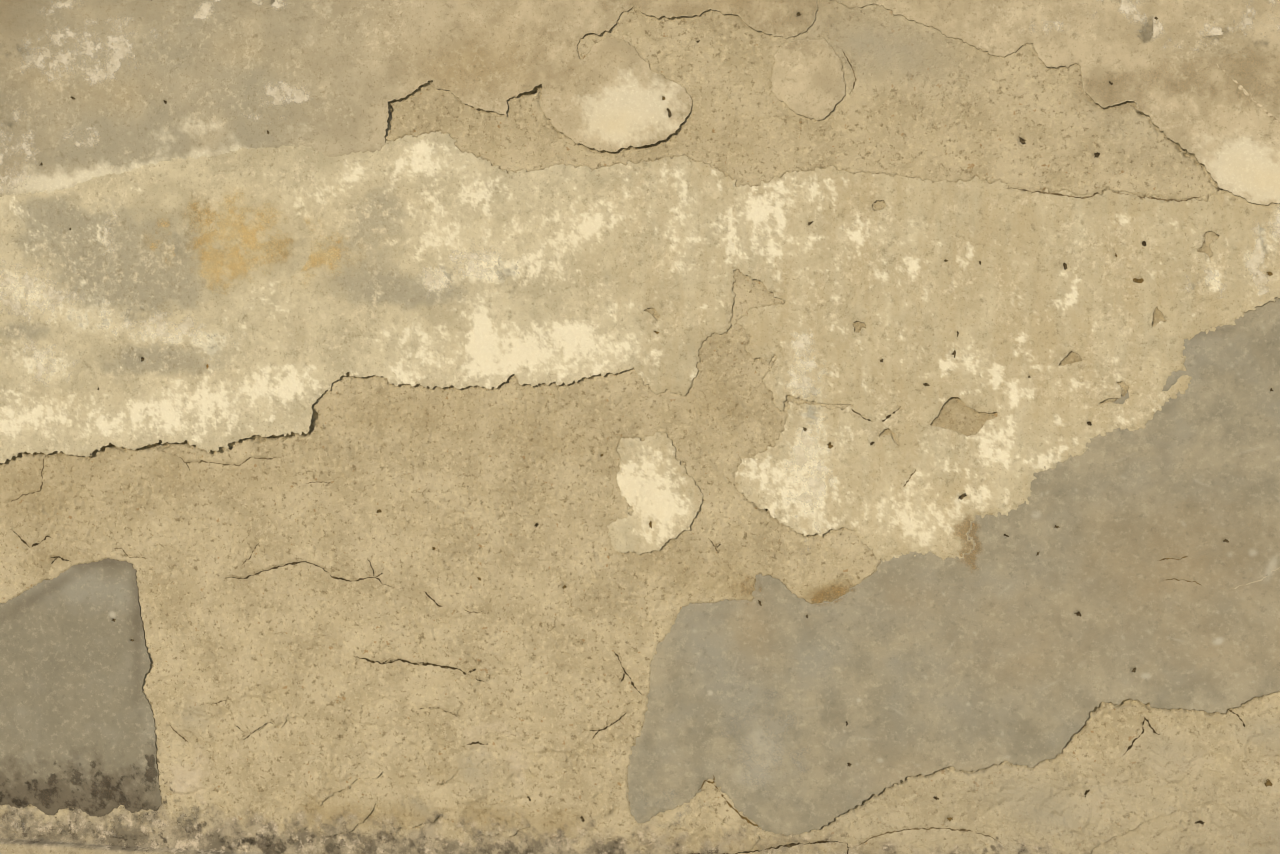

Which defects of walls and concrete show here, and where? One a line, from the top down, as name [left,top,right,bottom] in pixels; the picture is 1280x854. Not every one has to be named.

spalling [385,0,1280,205]
spalling [872,200,886,211]
crack [228,543,484,613]
spalling [0,255,1280,854]
crack [354,656,487,684]
damp [0,755,172,837]
damp [227,833,286,854]